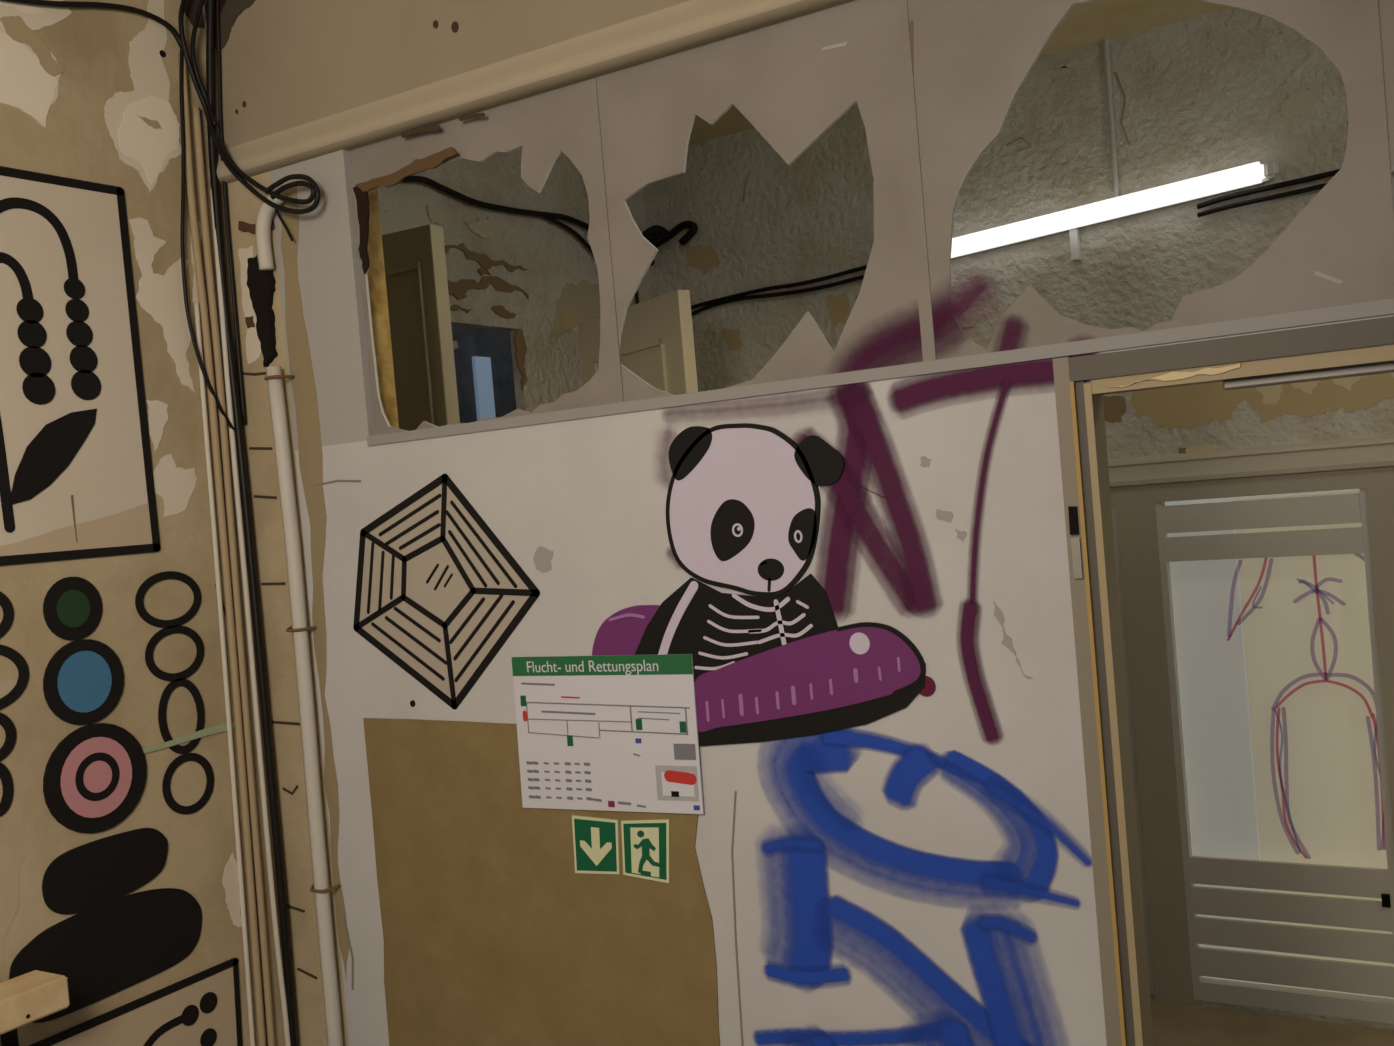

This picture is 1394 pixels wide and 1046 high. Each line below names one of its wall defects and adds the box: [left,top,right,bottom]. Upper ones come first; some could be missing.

peeling [0,0,64,125]
peeling [118,95,180,184]
peeling [401,125,440,138]
peeling [353,147,459,274]
peeling [445,243,529,390]
peeling [549,280,600,338]
peeling [1109,363,1394,430]